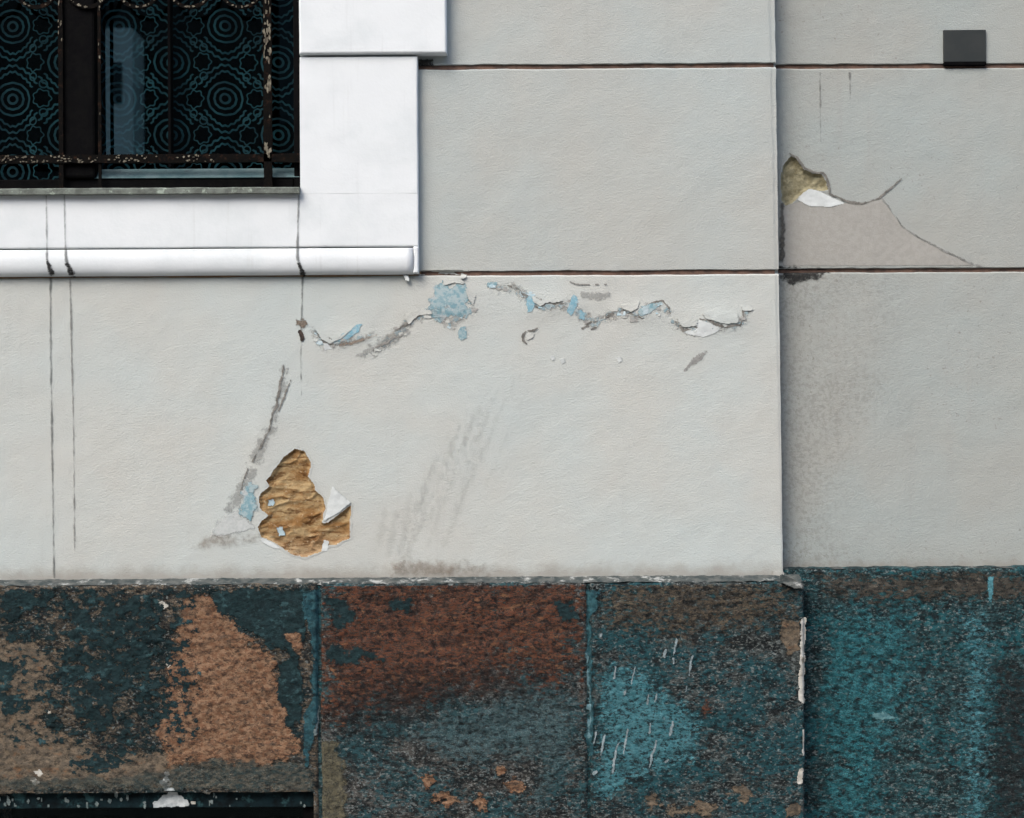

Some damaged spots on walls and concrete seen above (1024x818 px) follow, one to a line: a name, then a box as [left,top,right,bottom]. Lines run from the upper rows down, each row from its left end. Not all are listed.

peeling [778,153,974,266]
crack [829,178,982,267]
peeling [313,269,477,359]
peeling [487,281,753,337]
crack [212,364,291,537]
flaking render [256,446,353,560]
peeling [0,587,310,808]